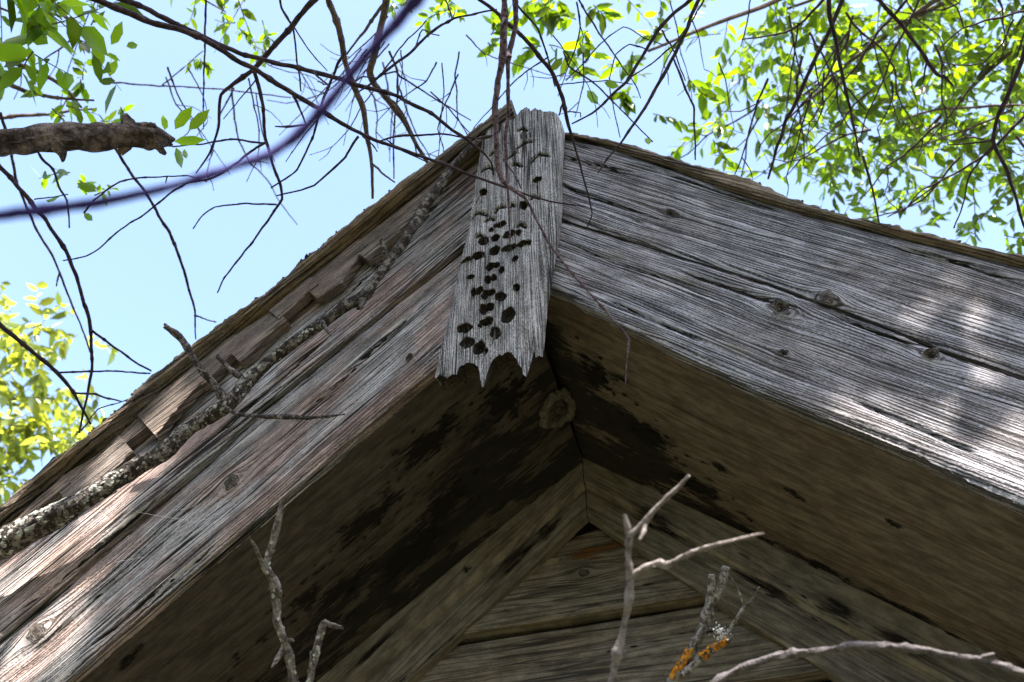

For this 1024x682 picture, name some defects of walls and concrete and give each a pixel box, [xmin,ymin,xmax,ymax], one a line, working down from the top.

water stain [498,518,561,574]